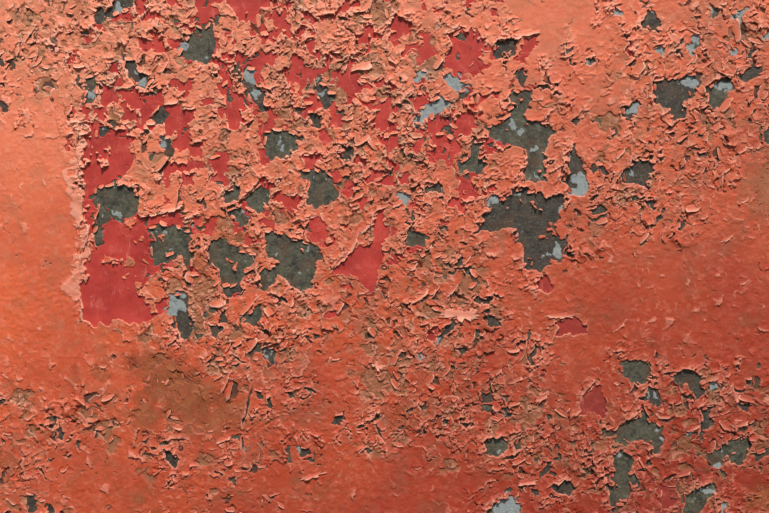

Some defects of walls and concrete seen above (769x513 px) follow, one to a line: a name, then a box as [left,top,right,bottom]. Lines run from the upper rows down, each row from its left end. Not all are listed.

peeling [0,0,343,401]
peeling [68,394,132,443]
peeling [41,420,69,462]
peeling [138,410,209,500]
peeling [214,442,266,477]
peeling [296,446,315,459]
peeling [3,486,55,513]